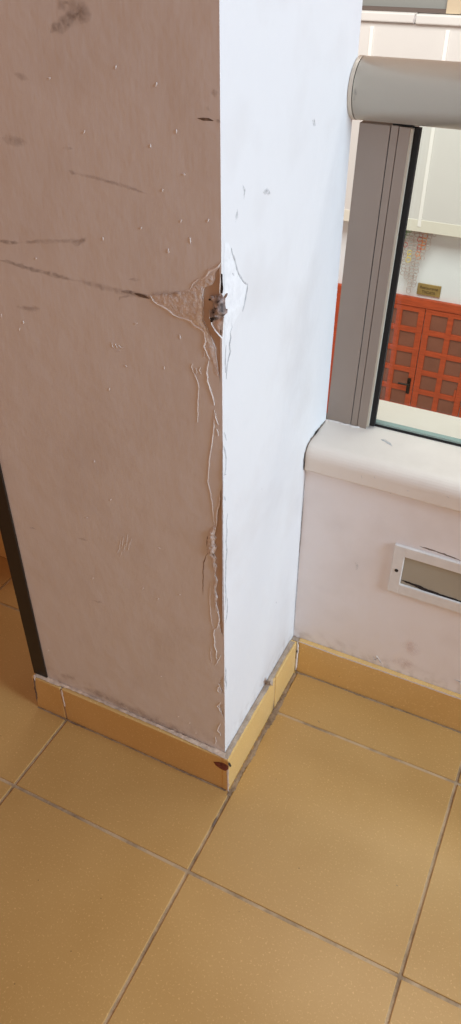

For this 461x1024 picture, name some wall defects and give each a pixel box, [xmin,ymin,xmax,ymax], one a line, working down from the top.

flaking render [134,242,248,405]
crack [191,365,228,619]